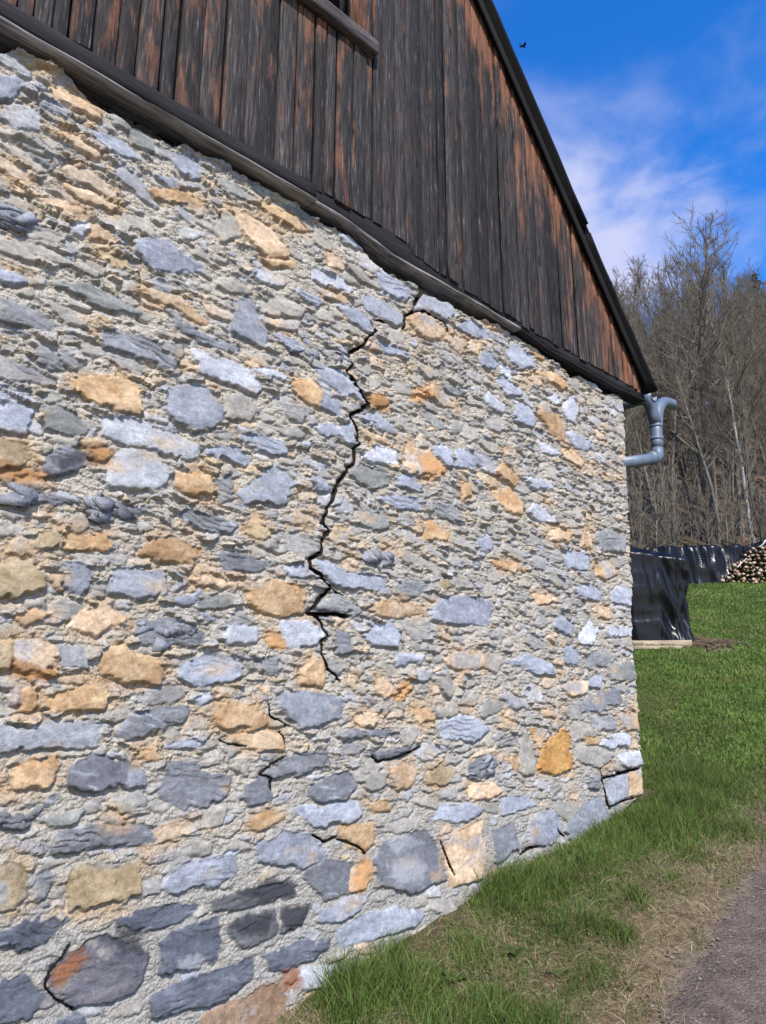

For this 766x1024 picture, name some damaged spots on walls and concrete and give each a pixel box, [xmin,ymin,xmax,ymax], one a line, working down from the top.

crack [305,289,448,682]
crack [258,704,286,790]
crack [599,768,642,810]
crack [311,835,365,854]
crack [43,944,73,1010]